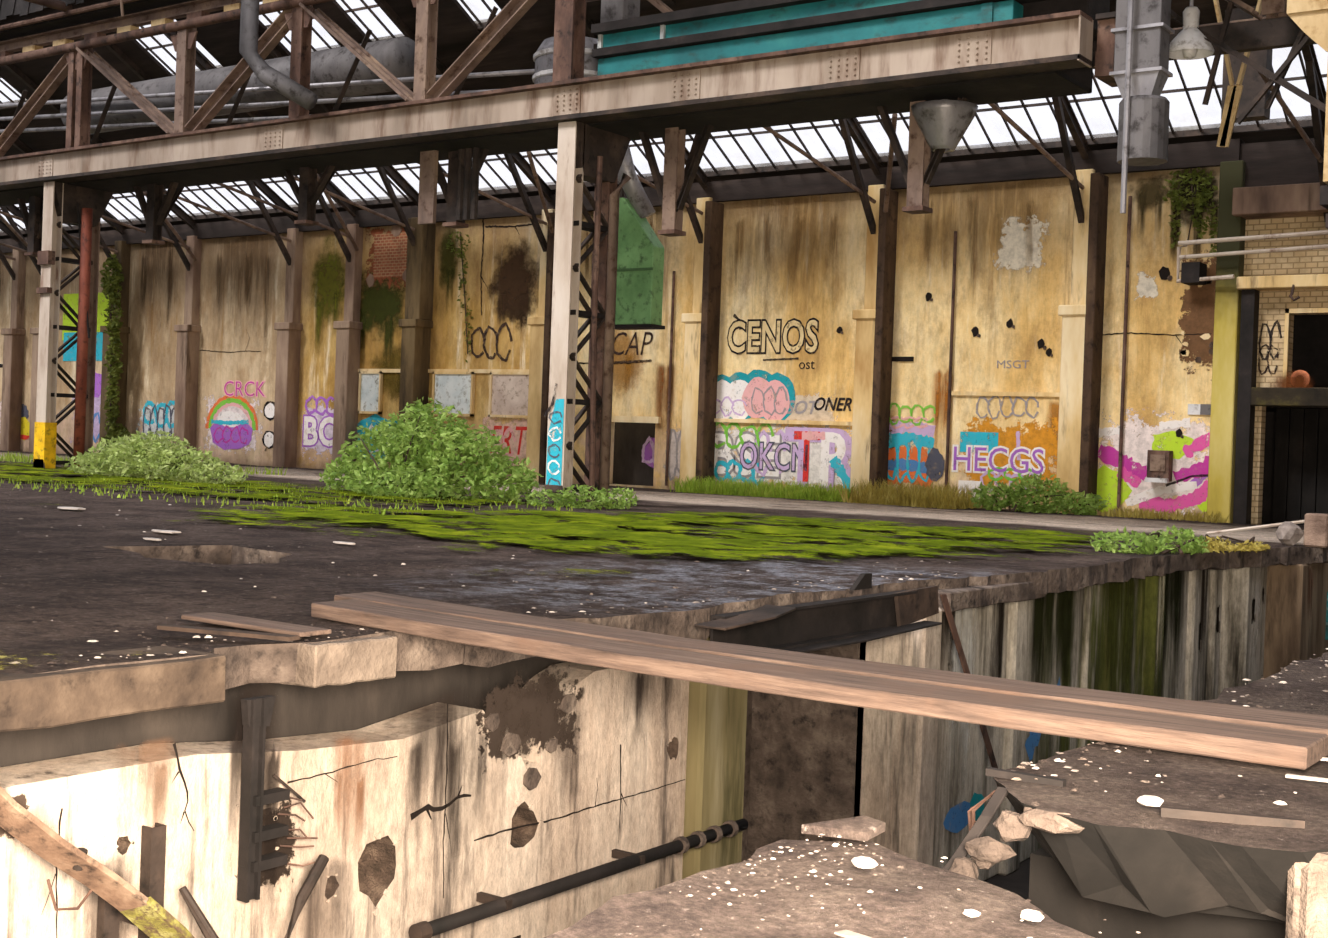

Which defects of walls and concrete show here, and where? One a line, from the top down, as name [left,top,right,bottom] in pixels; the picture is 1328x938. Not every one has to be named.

leakage [489,242,540,325]
peeling [993,214,1049,273]
peeling [1134,249,1217,381]
crack [172,743,194,831]
spalling [0,662,689,938]
crack [410,702,685,898]